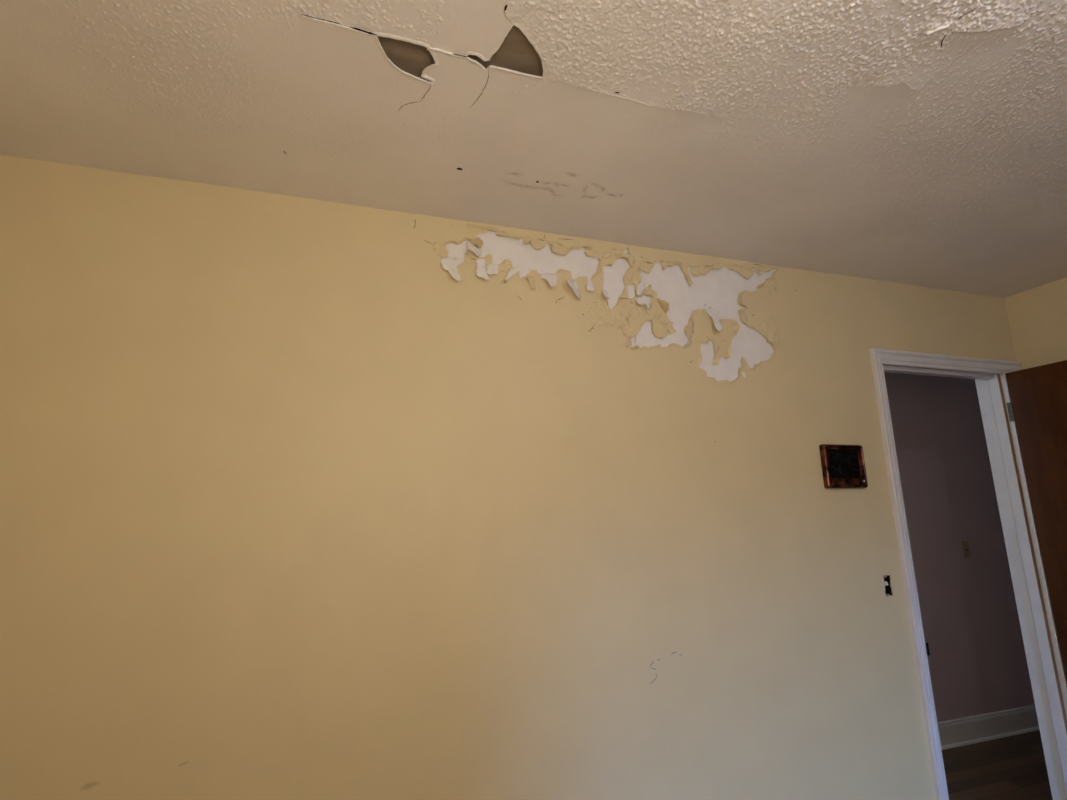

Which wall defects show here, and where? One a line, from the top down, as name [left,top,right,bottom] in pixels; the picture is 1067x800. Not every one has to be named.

crack [300,14,376,37]
crack [427,48,489,109]
peeling [426,224,781,385]